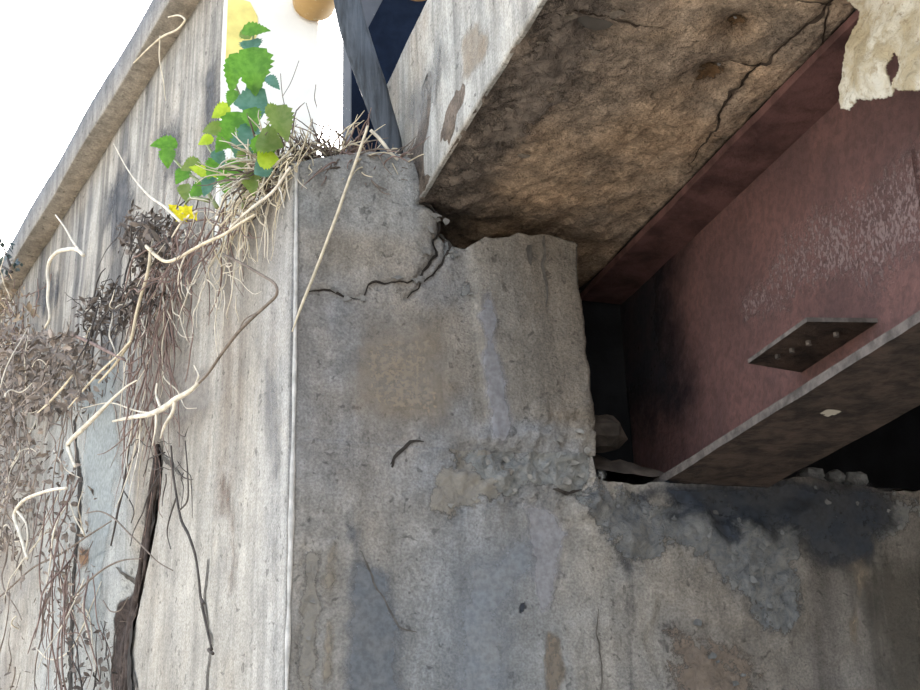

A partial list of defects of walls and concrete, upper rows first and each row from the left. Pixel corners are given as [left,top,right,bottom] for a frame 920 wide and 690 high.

crack [691,0,834,163]
crack [309,202,452,302]
crack [110,443,183,690]
water stain [628,479,920,690]